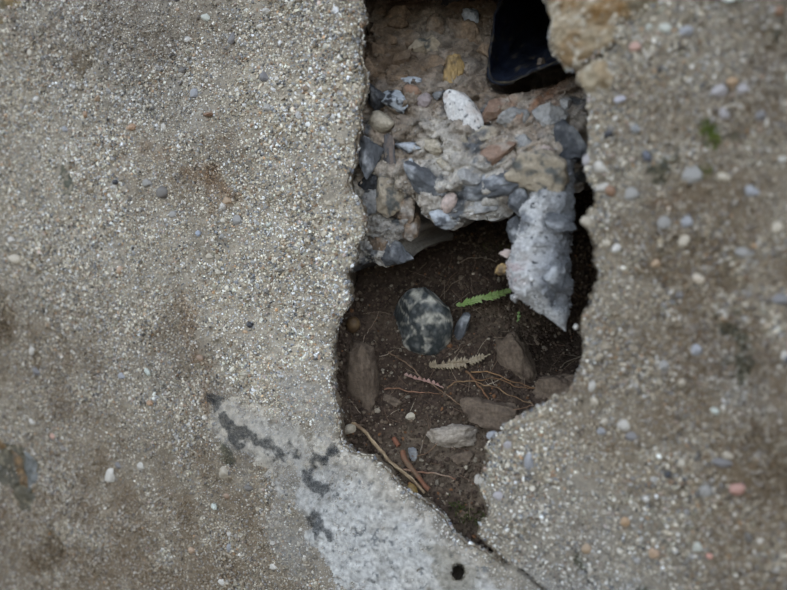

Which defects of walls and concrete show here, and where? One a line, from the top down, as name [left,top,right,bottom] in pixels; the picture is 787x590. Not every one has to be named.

spalling [329,0,625,562]